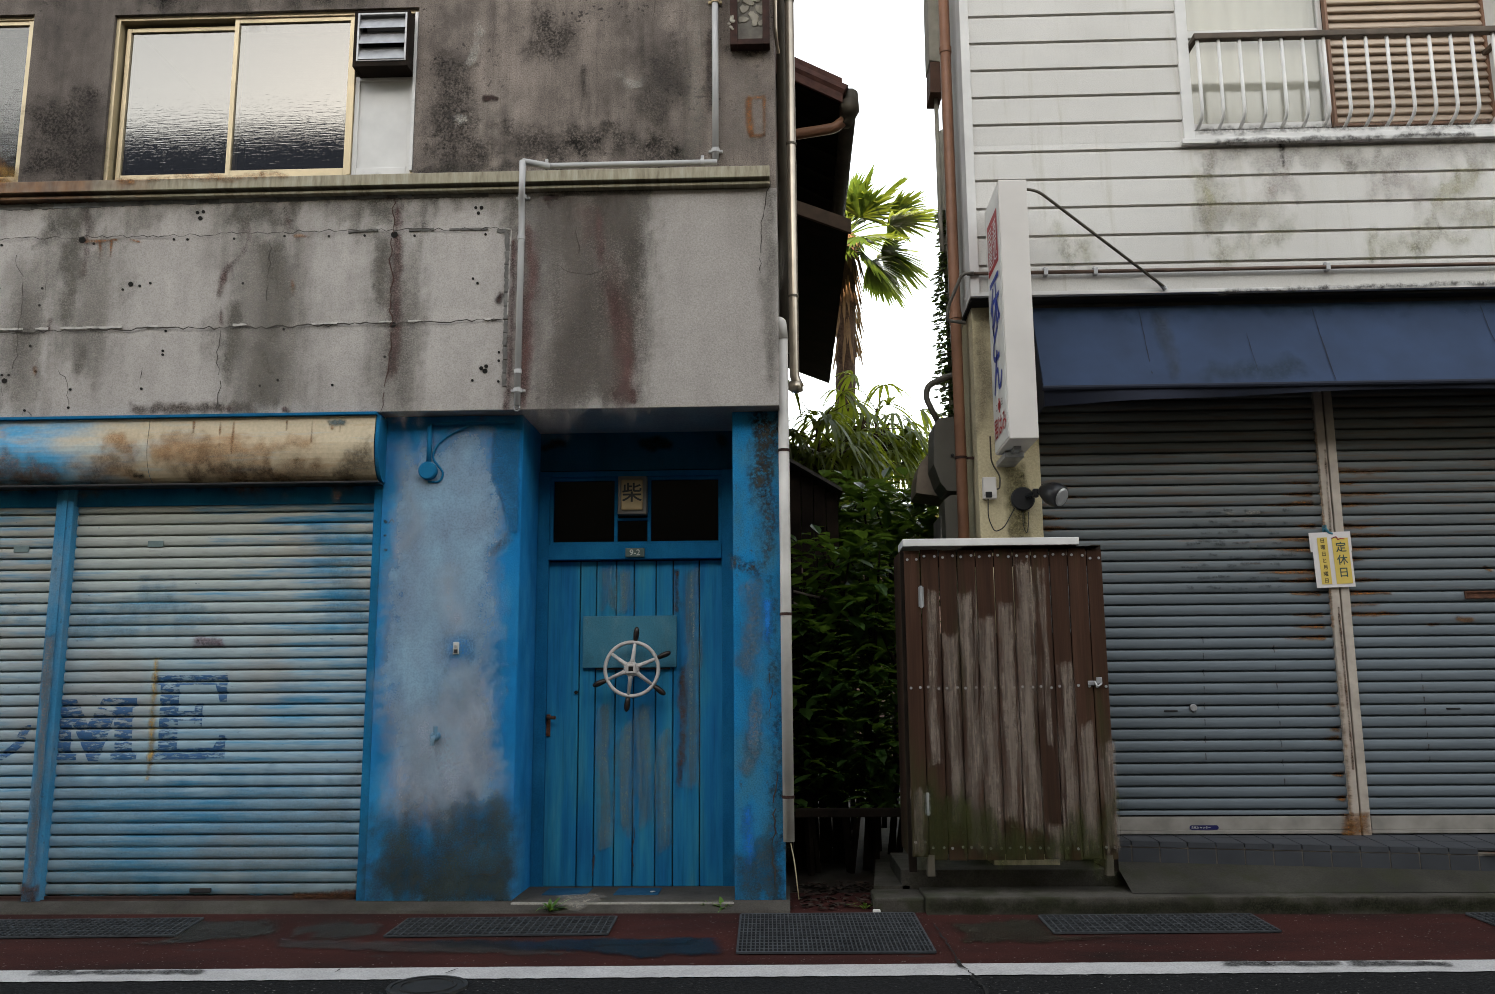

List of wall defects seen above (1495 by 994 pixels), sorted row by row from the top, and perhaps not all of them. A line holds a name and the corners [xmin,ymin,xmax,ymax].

leakage [24,91,100,178]
leakage [419,30,686,173]
leakage [706,31,766,110]
leakage [508,190,646,409]
corrosion [154,421,370,491]
leakage [364,795,516,902]